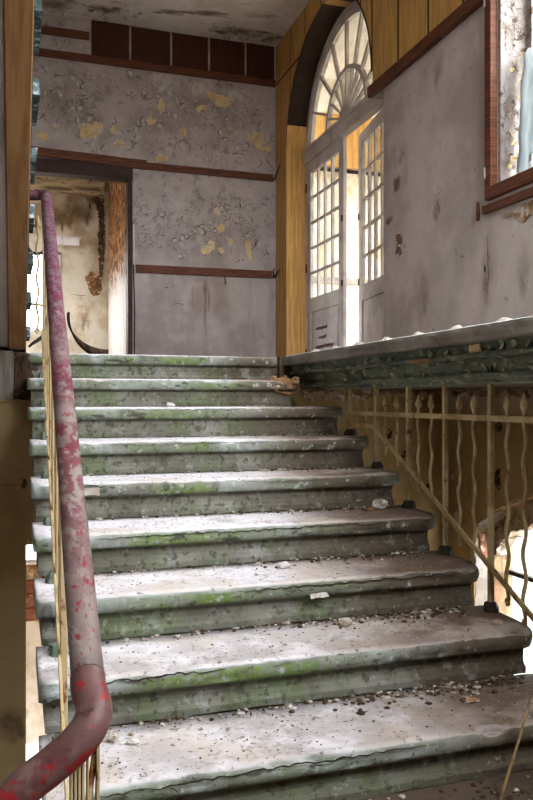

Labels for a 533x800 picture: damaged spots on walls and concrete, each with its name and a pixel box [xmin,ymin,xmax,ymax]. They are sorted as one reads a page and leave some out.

peeling [34,73,271,168]
spalling [85,196,107,296]
peeling [139,197,269,262]
spalling [395,233,403,259]
spalling [503,200,533,222]
spalling [269,351,450,403]
peeling [443,339,533,379]